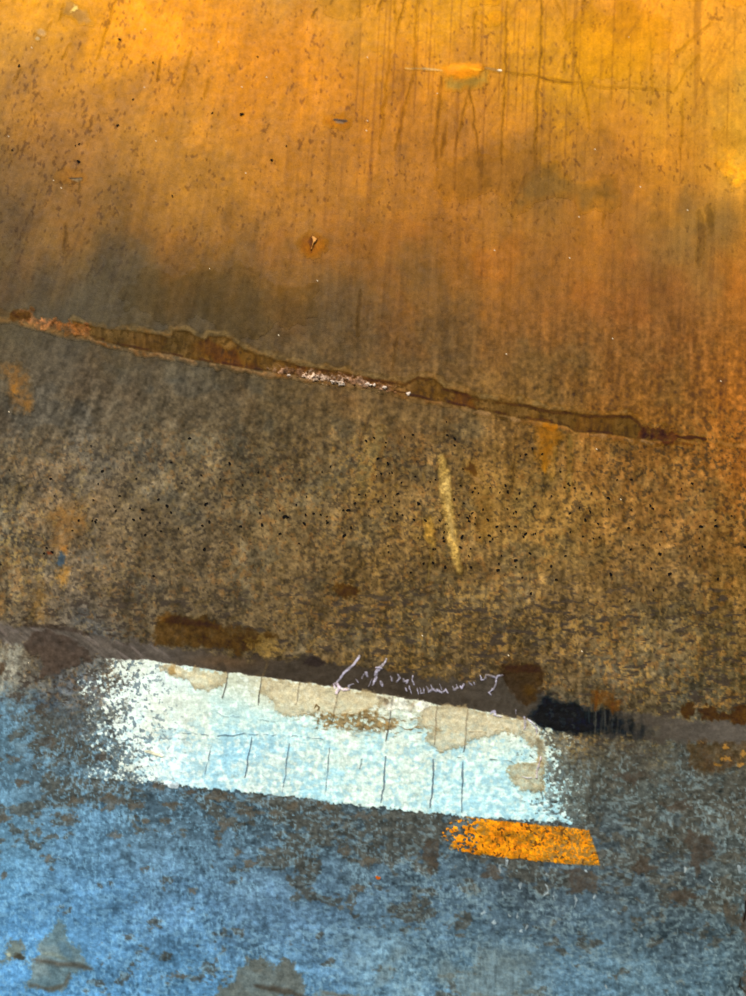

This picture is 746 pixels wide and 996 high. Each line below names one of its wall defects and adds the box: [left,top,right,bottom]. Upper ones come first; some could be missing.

rust [712,112,746,192]
crack [0,305,746,450]
peeling [93,750,113,764]
peeling [283,798,377,822]
peeling [0,915,97,994]
peeling [211,952,373,996]